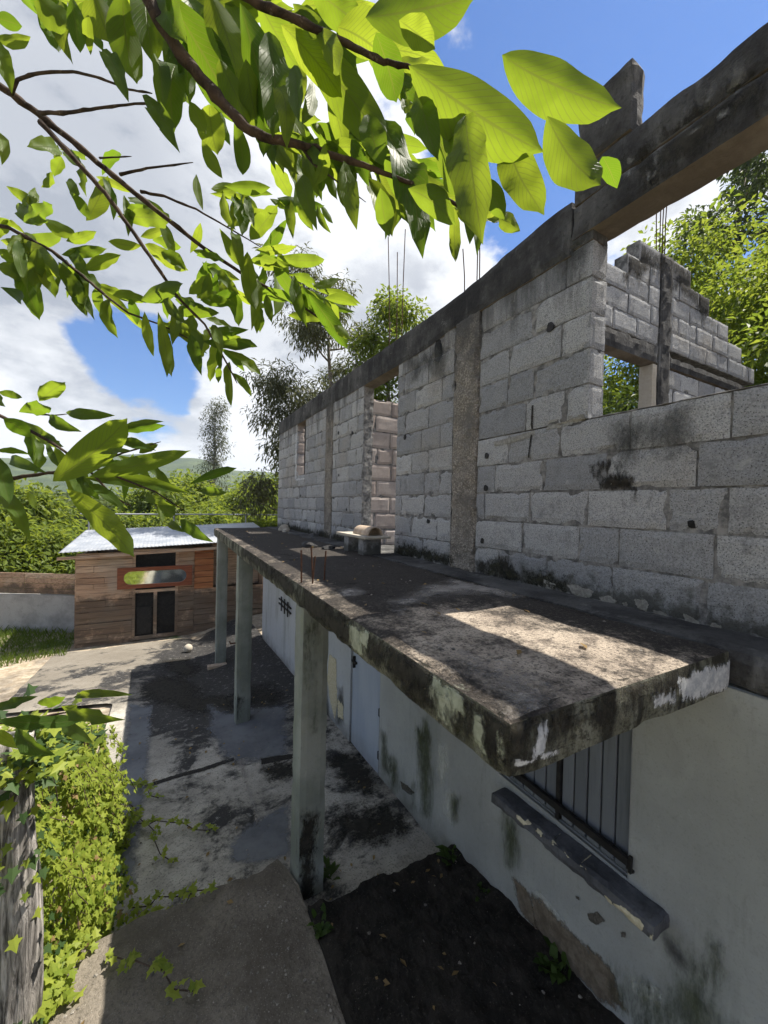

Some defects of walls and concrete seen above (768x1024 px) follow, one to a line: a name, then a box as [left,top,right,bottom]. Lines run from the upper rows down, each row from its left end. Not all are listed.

leakage [591,416,683,497]
leakage [366,633,681,769]
peeling [654,661,730,709]
leakage [417,721,431,814]
peeling [516,815,569,858]
peeling [604,895,652,940]